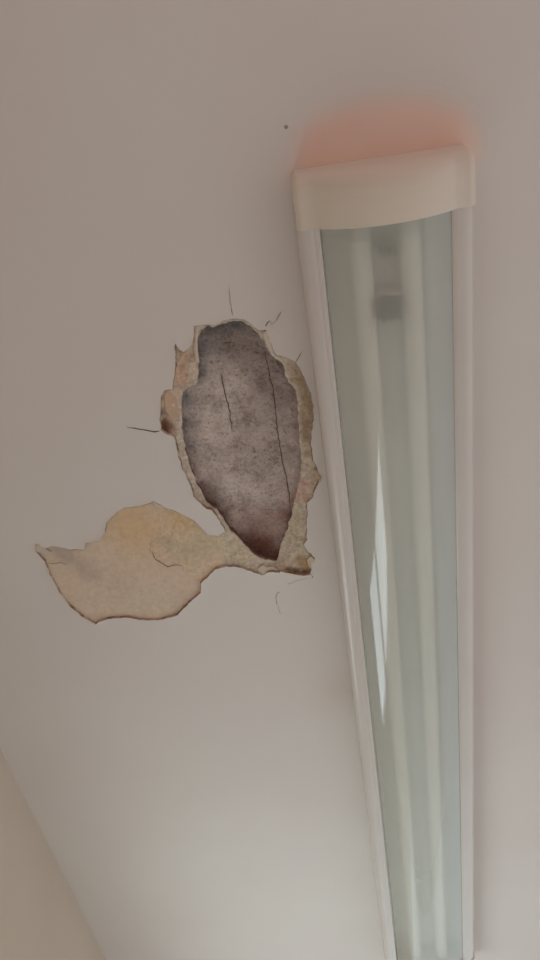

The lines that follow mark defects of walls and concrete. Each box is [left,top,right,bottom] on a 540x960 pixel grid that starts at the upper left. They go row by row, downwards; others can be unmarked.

flaking render [36,319,322,625]